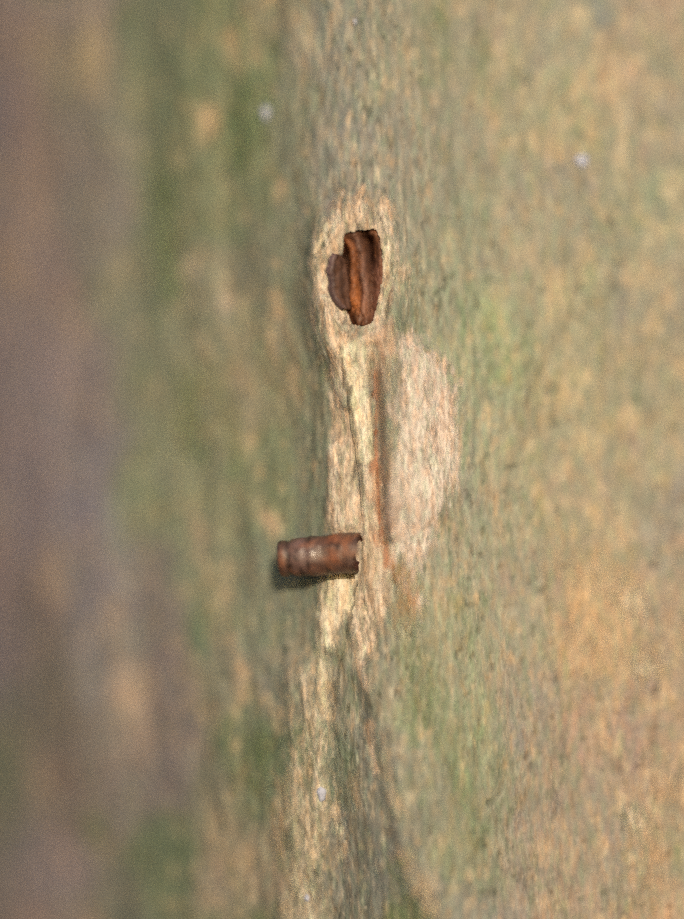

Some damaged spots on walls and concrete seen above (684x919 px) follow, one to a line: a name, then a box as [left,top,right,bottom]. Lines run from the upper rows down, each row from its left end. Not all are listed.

peeling [284,185,461,919]
corrosion [372,397,389,566]